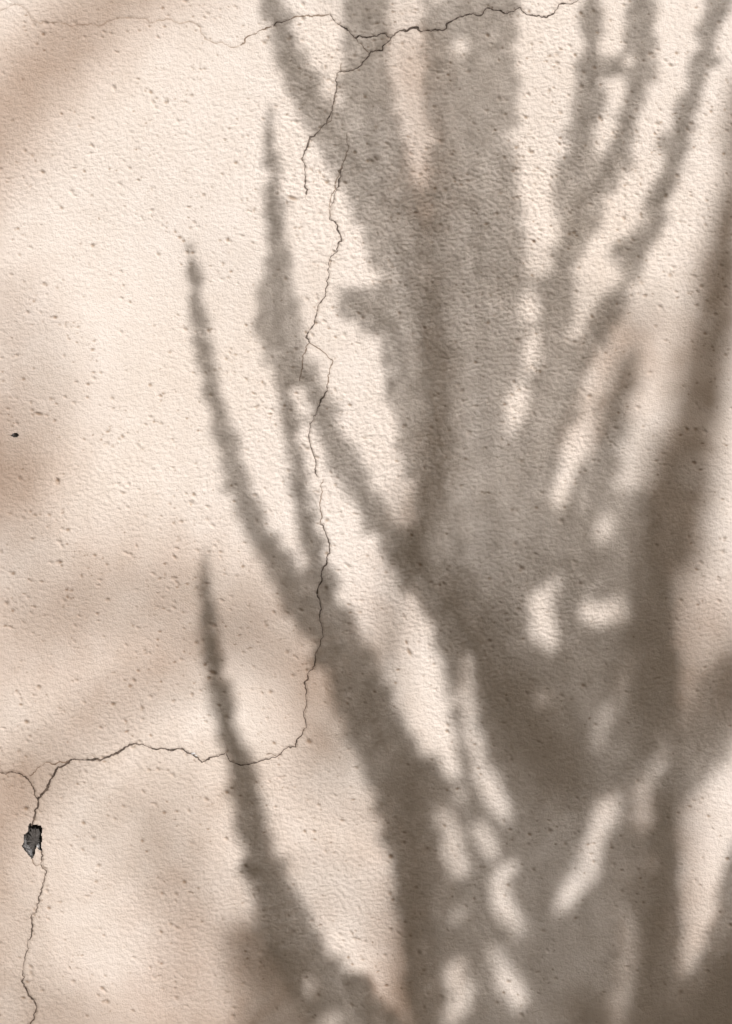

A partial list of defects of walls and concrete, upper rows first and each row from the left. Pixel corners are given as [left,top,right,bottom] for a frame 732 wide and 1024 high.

crack [0,0,578,826]
spalling [22,823,42,859]
crack [21,851,47,1024]